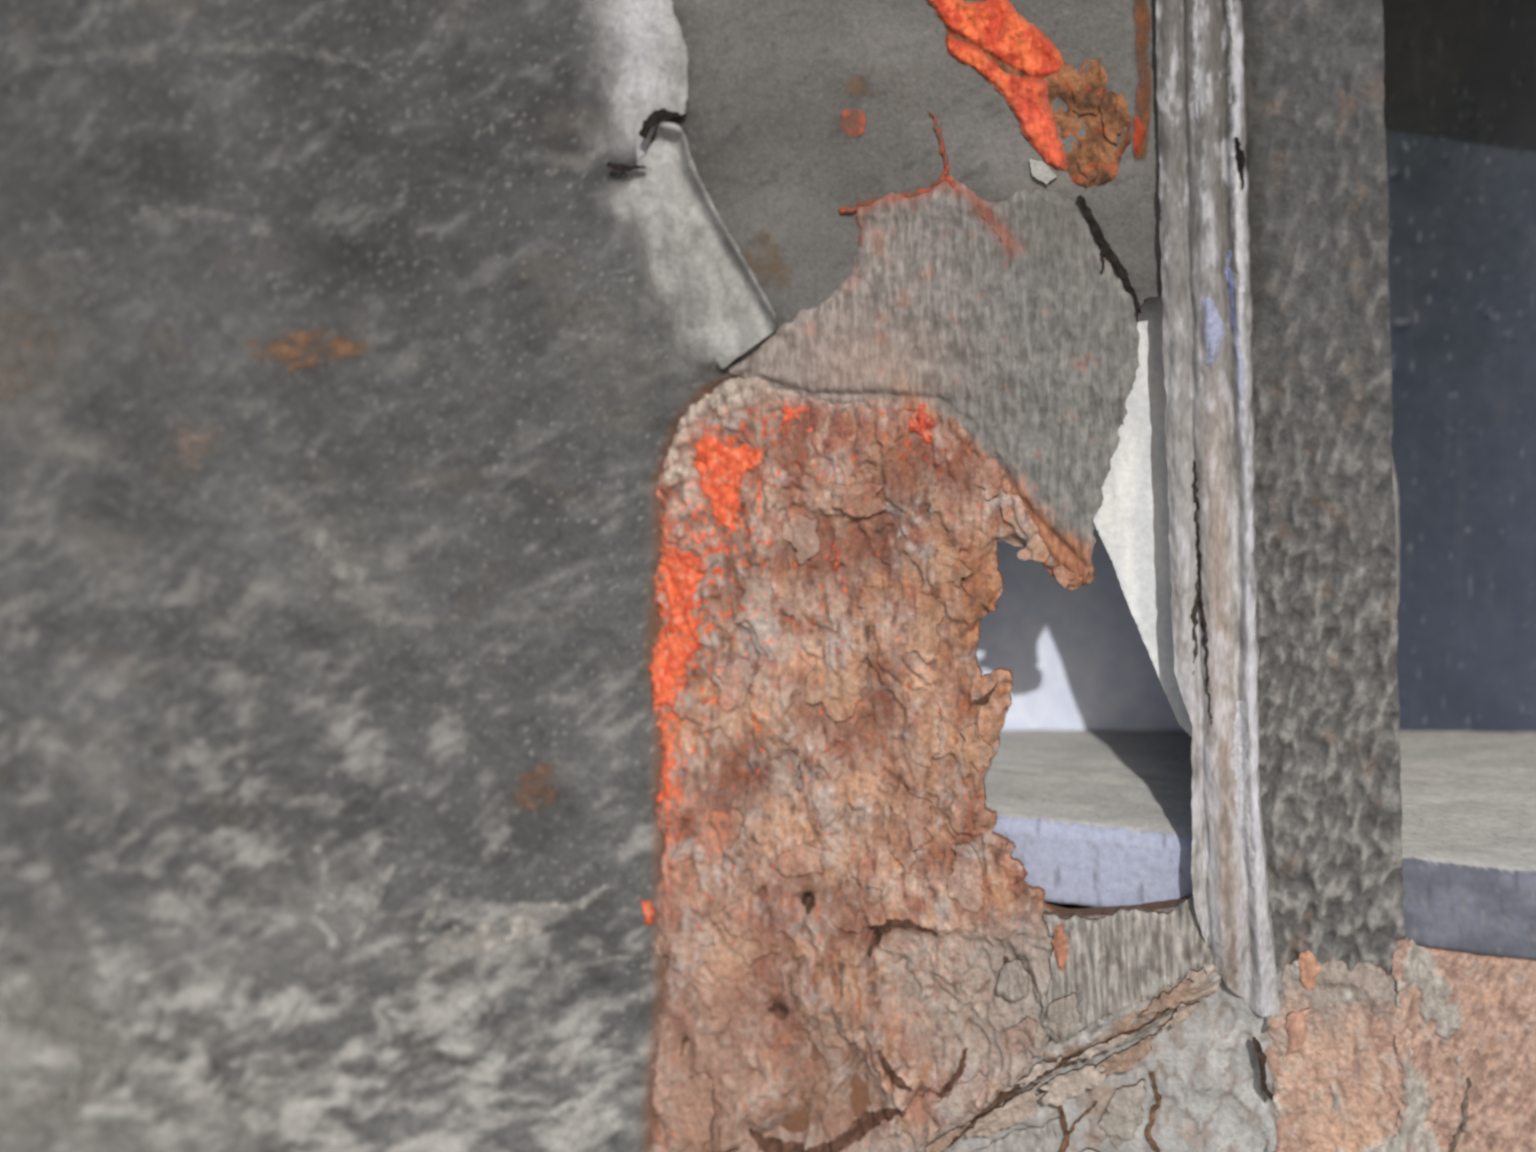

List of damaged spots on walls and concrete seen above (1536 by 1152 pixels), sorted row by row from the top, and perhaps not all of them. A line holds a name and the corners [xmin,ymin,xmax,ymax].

peeling [589,0,1140,583]
crack [1077,195,1141,314]
rust [639,376,1095,1152]
peeling [904,893,1222,1152]
crack [1056,1101,1097,1152]
crack [1145,1071,1162,1152]